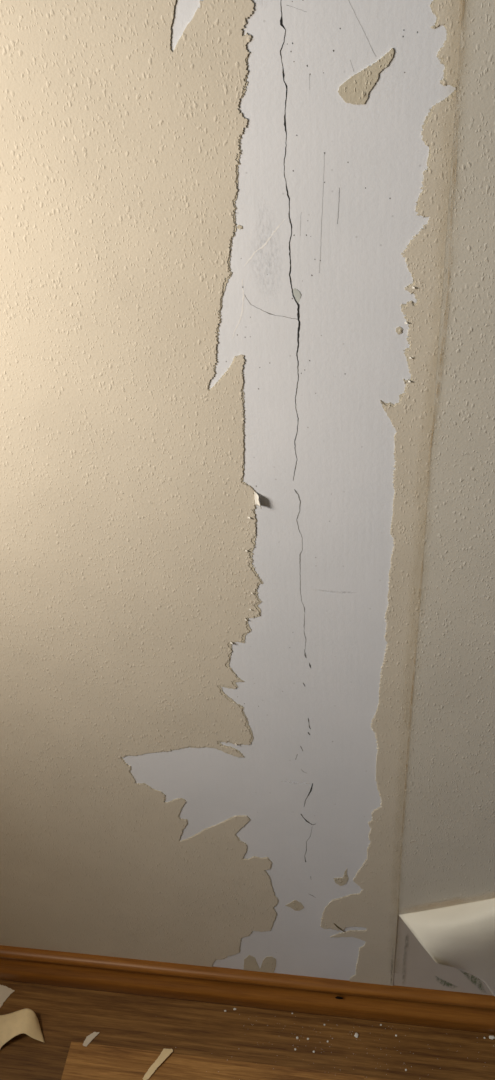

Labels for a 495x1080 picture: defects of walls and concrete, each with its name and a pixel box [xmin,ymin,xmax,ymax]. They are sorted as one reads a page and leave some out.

crack [245,3,311,686]
peeling [121,0,456,981]
peeling [393,898,495,996]